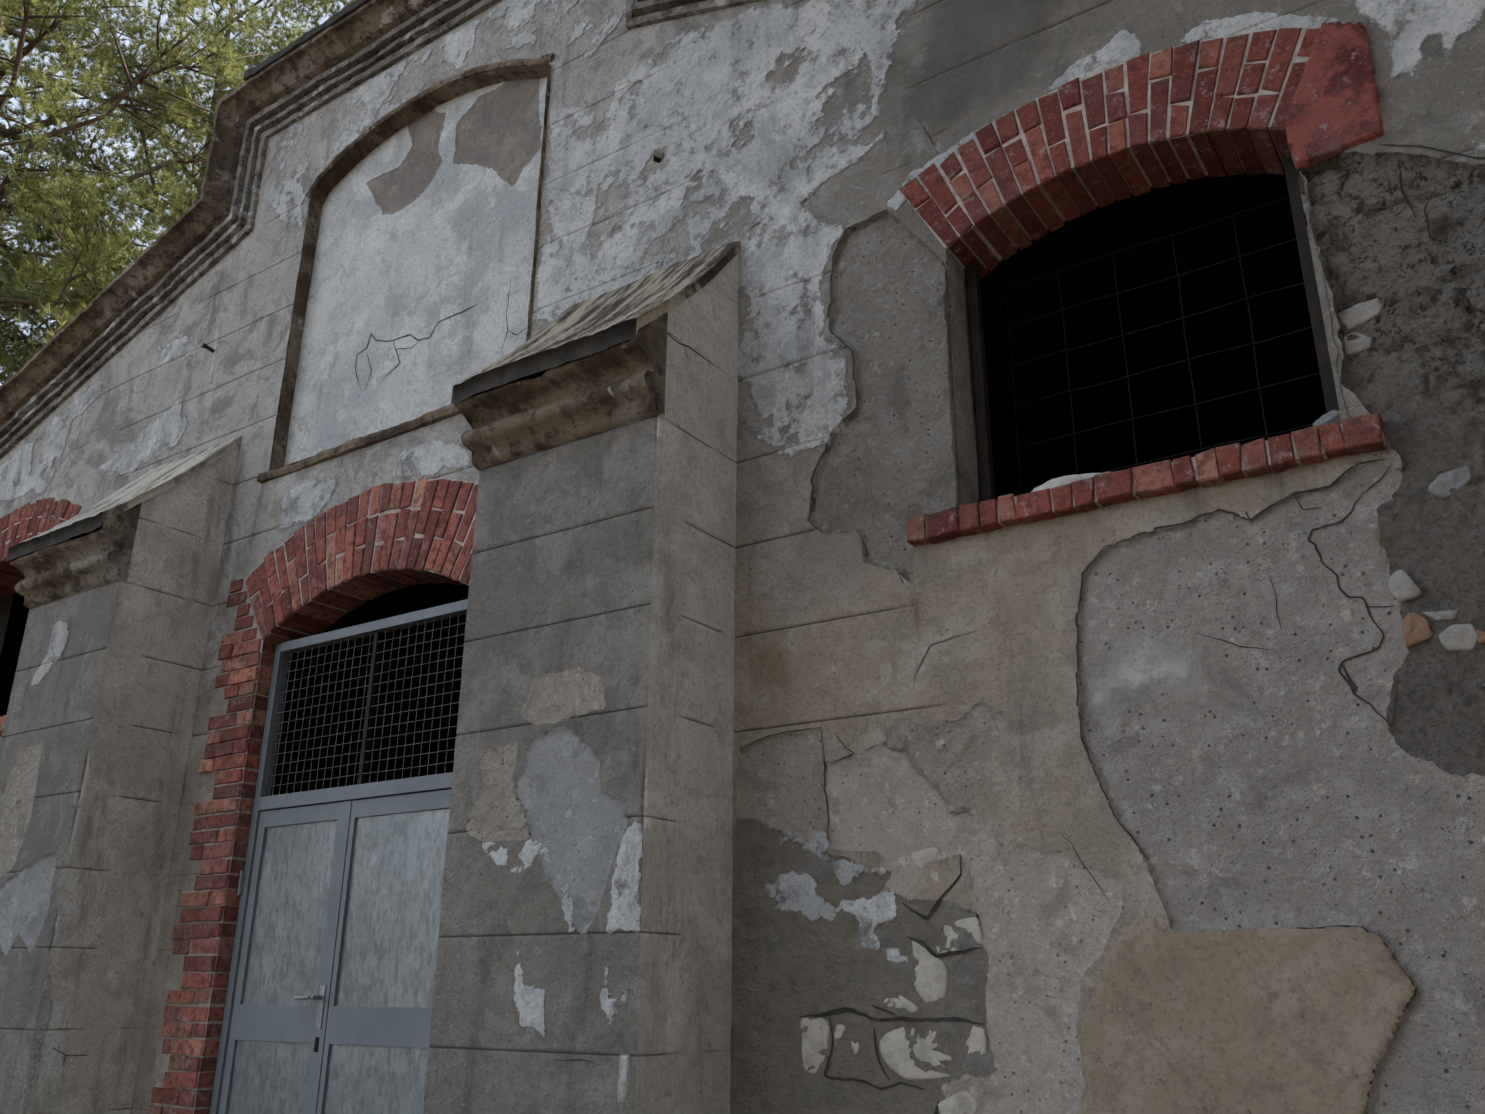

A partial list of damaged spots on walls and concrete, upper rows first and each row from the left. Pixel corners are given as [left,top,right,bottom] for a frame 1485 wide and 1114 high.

peeling [265,0,626,229]
peeling [1180,0,1485,80]
crack [355,281,527,389]
peeling [367,0,1142,583]
peeling [279,477,336,531]
crack [1075,459,1397,860]
flaking render [1076,140,1485,1114]
flaking render [0,742,57,955]
peeling [514,950,545,1037]
flaking render [466,666,643,934]
flaking render [730,701,1124,1114]
crack [1059,833,1108,900]